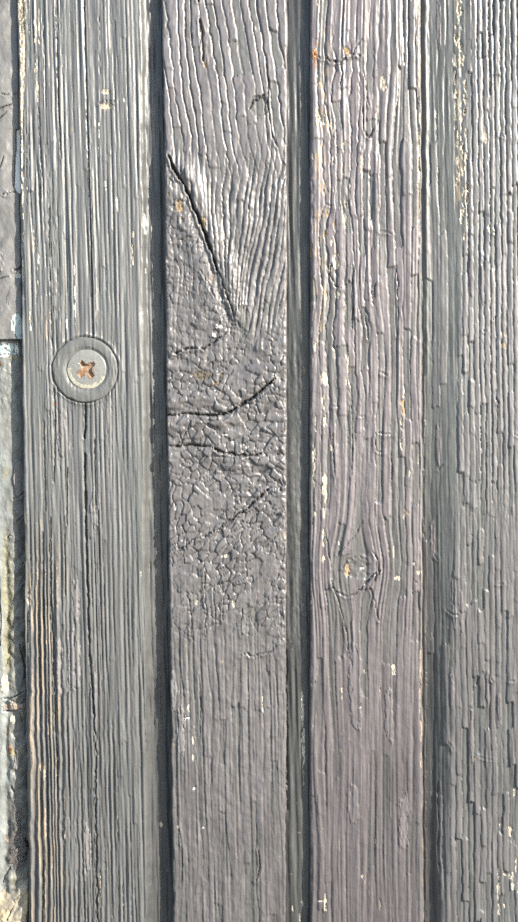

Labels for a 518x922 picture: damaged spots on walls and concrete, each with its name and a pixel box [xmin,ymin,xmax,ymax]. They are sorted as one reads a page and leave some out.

crack [38,0,62,343]
crack [83,0,94,334]
crack [169,158,234,354]
peeling [315,108,351,272]
peeling [453,0,485,305]
crack [168,374,275,457]
crack [179,489,268,551]
peeling [312,443,328,518]
peeling [497,858,518,915]